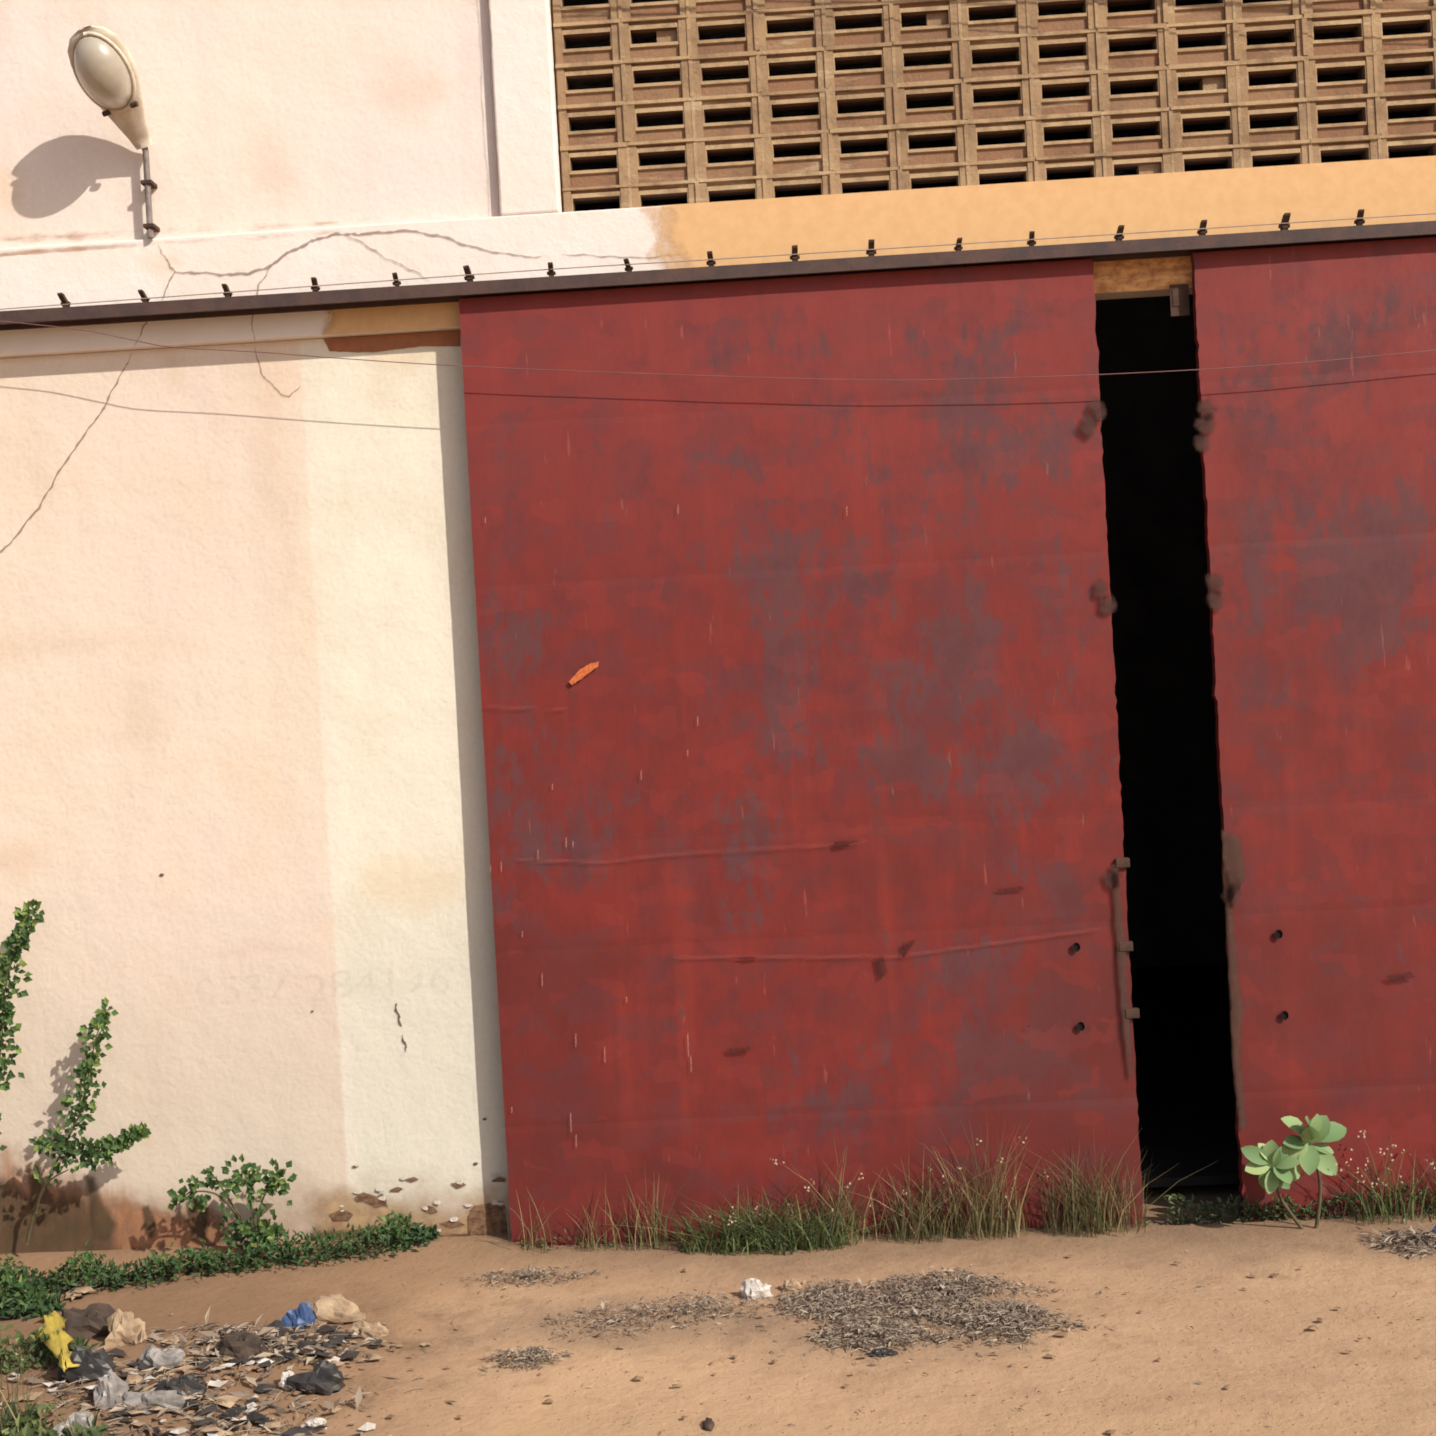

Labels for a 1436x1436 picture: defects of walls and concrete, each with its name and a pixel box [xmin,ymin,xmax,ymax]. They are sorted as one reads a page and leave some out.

rust [1080,400,1105,436]
rust [1195,399,1218,451]
rust [1207,574,1223,611]
rust [1105,865,1133,1077]
rust [1222,831,1247,1131]
water stain [0,1173,115,1254]
water stain [314,1198,471,1241]
peeling [329,1177,507,1240]